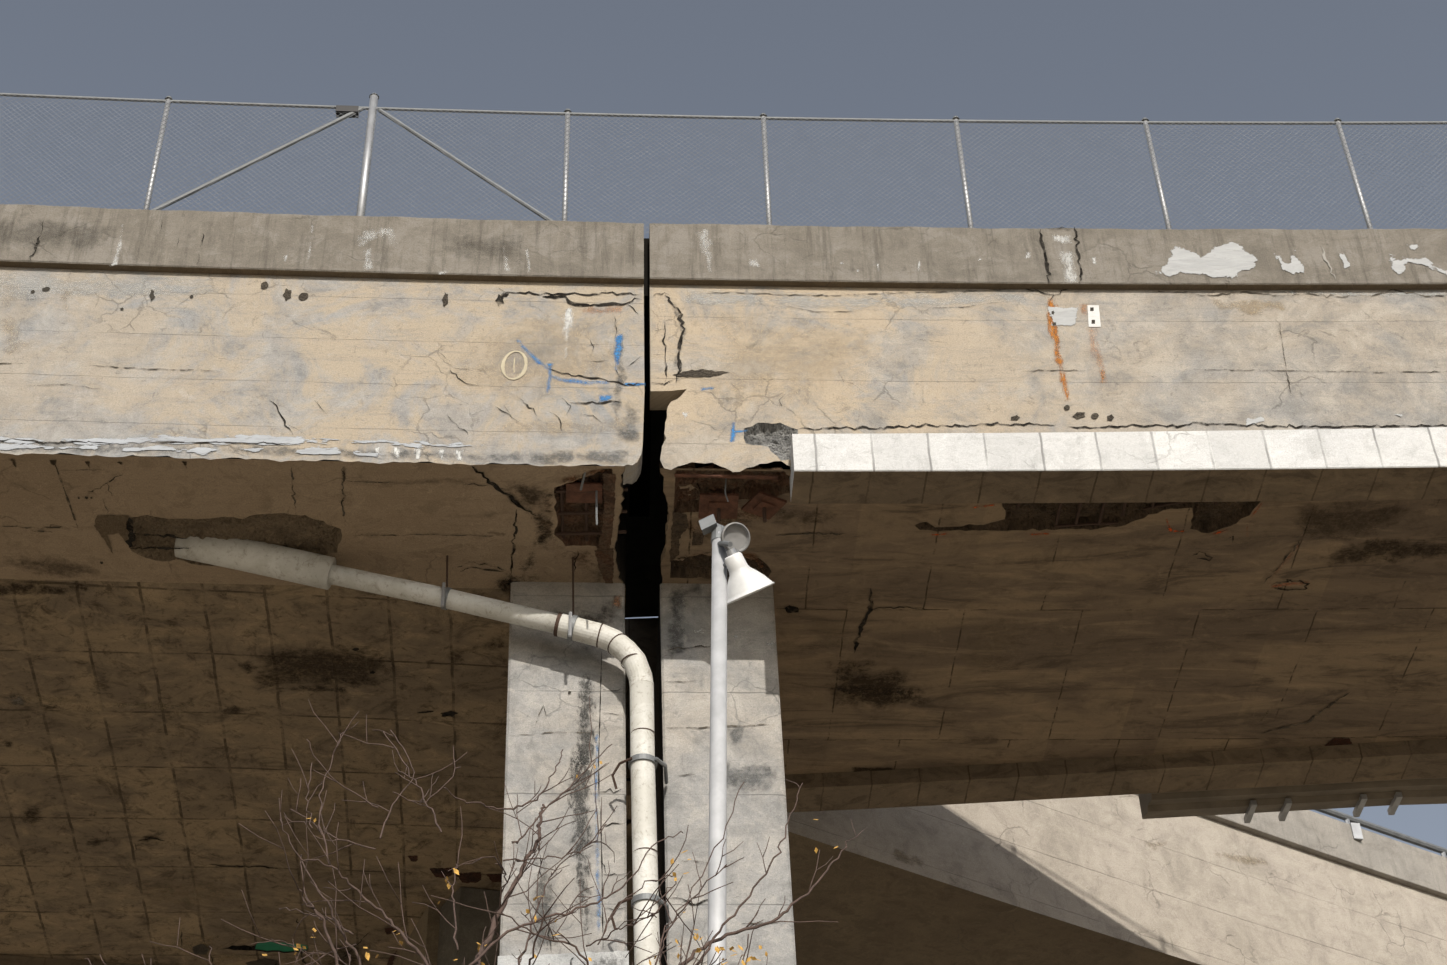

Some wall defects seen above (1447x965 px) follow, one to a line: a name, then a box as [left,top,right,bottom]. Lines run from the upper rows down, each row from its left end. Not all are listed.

crack [712,227,1083,342]
peeling [1156,242,1257,279]
crack [439,288,685,429]
corrosion [1047,300,1069,399]
peeling [0,434,482,457]
crack [341,416,536,583]
spalling [669,511,771,579]
spalling [914,501,1261,533]
leakage [1303,507,1447,563]
leakage [239,649,385,692]
crack [514,652,628,932]
leakage [568,679,598,931]